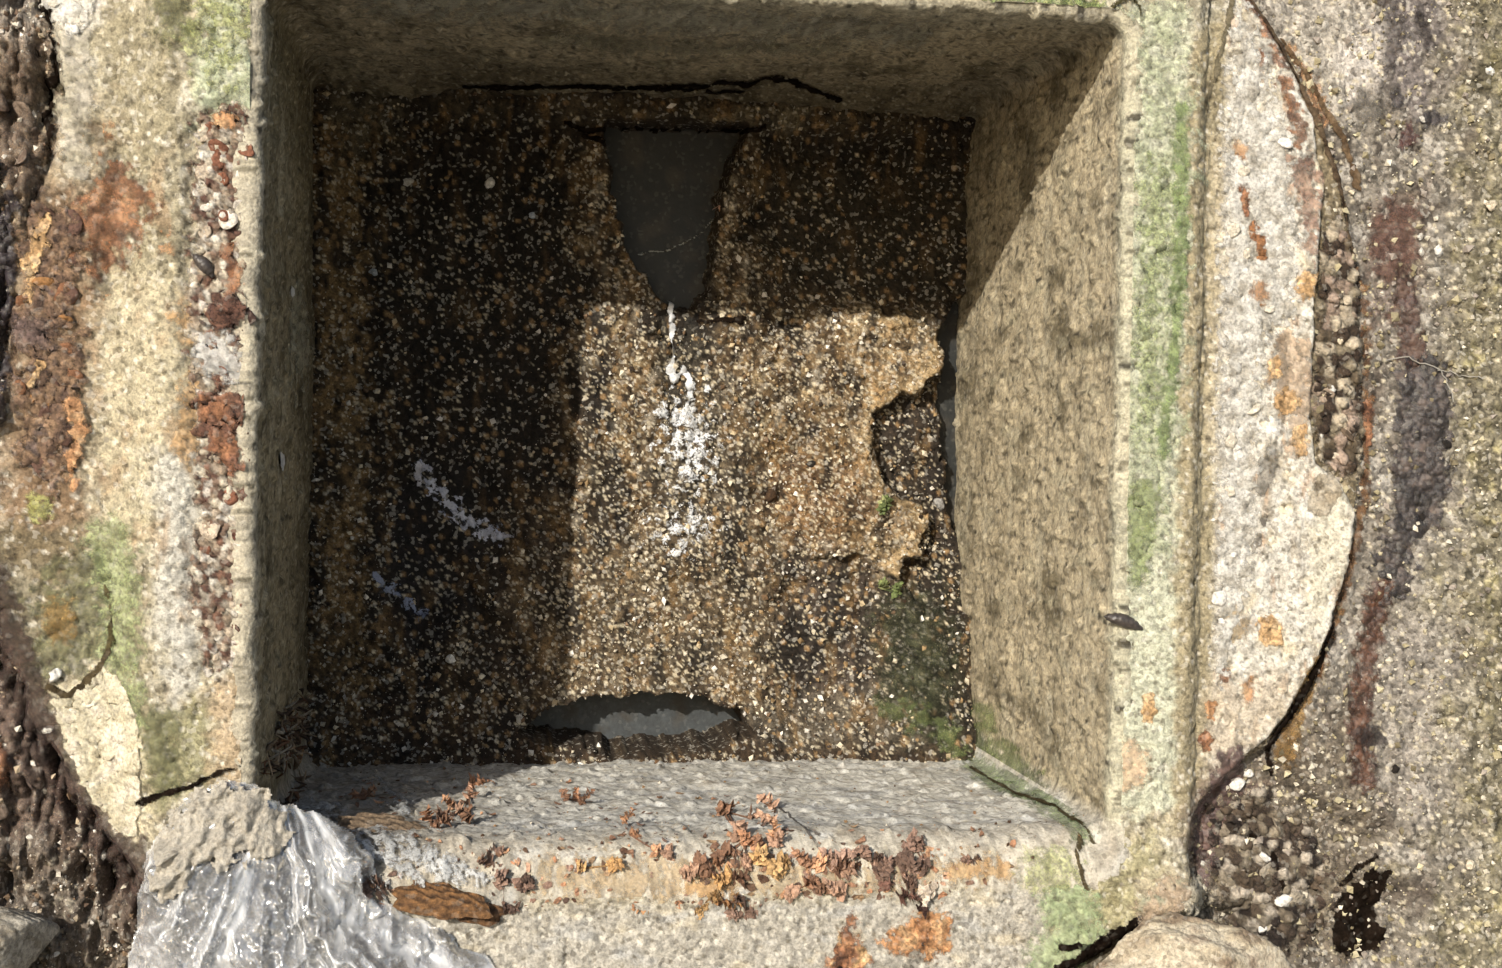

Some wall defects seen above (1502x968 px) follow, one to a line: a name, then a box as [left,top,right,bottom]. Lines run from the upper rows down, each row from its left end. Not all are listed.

corrosion [0,0,172,502]
peeling [306,84,978,768]
crack [462,75,842,144]
corrosion [1238,183,1268,260]
corrosion [1249,281,1269,306]
crack [1206,0,1362,302]
corrosion [1245,0,1327,301]
corrosion [1264,328,1315,465]
leakage [1343,196,1467,795]
corrosion [0,651,174,968]
crack [135,765,239,806]
crack [1263,622,1335,777]